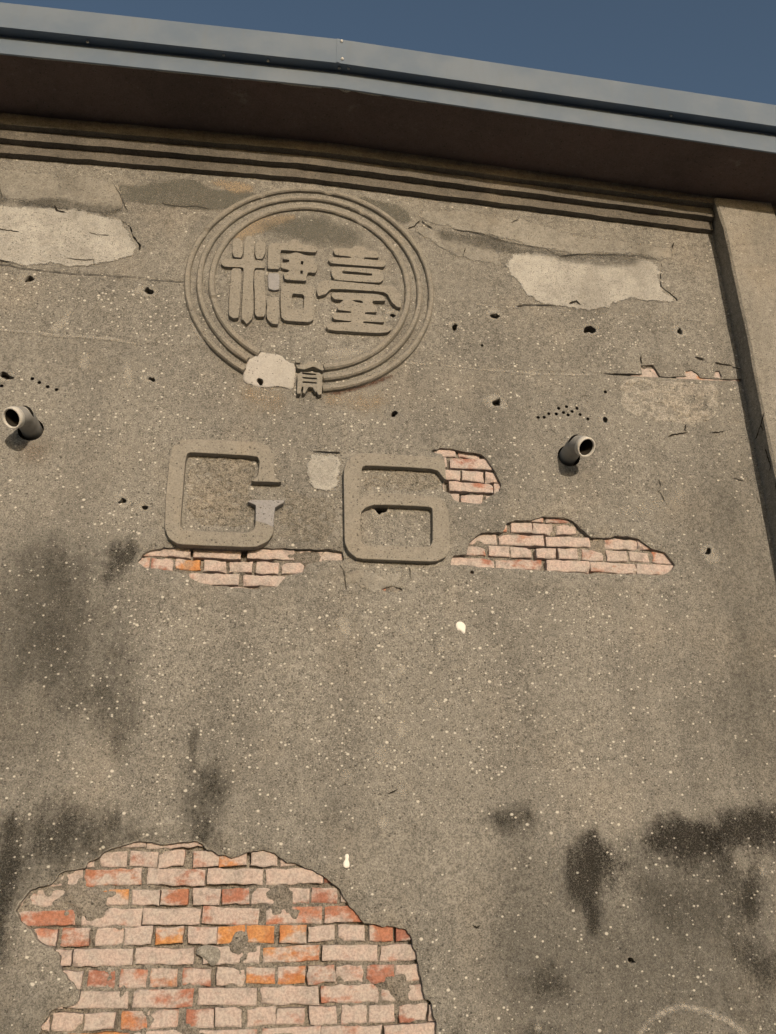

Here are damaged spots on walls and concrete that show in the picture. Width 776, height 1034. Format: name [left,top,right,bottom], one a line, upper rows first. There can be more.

flaking render [432,448,501,504]
water stain [104,540,138,581]
flaking render [138,547,344,590]
flaking render [451,517,675,575]
water stain [185,769,227,840]
water stain [493,809,532,831]
water stain [0,805,120,958]
water stain [565,828,628,934]
water stain [643,804,776,929]
flaking render [16,841,437,1034]
water stain [641,1004,744,1034]